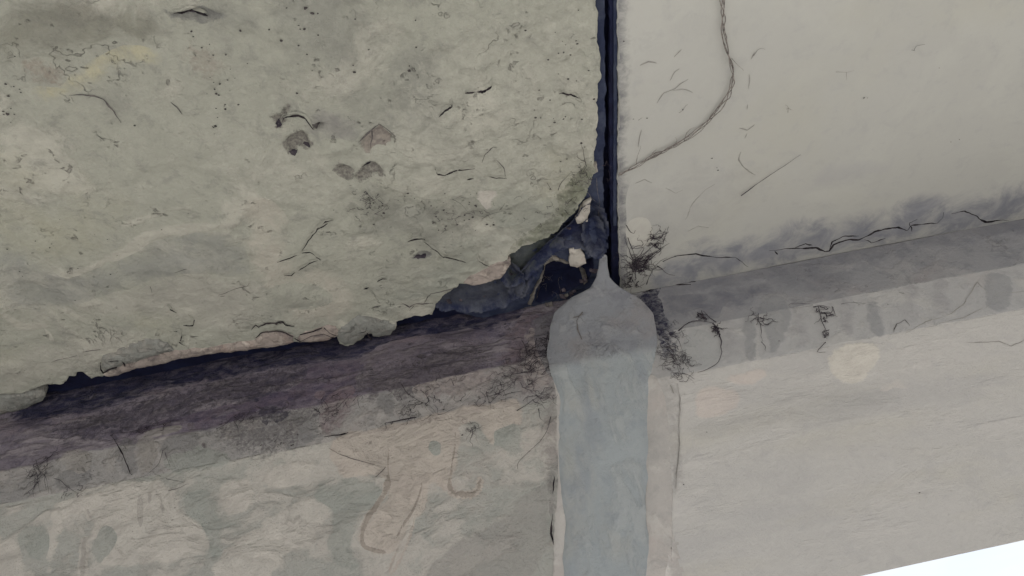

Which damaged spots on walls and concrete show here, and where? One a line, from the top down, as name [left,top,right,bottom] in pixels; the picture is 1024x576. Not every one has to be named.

crack [641,50,693,103]
peeling [0,0,609,394]
water stain [624,143,1024,369]
crack [770,211,1007,255]
water stain [2,307,527,479]
peeling [0,327,554,576]